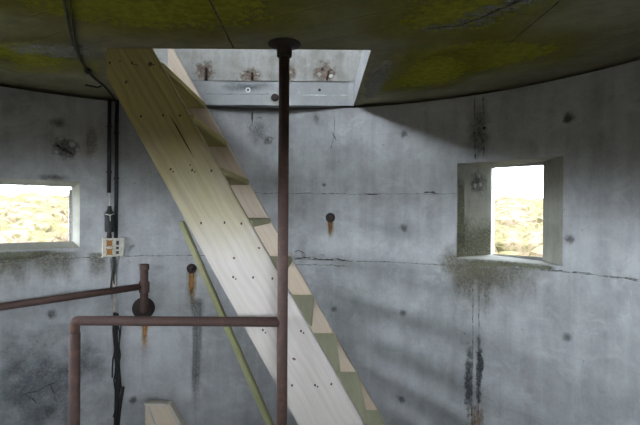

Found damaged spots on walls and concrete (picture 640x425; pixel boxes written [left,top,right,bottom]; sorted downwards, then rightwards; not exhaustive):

crack [420,0,560,50]
leakage [193,326,202,384]
crack [292,250,640,417]
leakage [476,338,484,403]